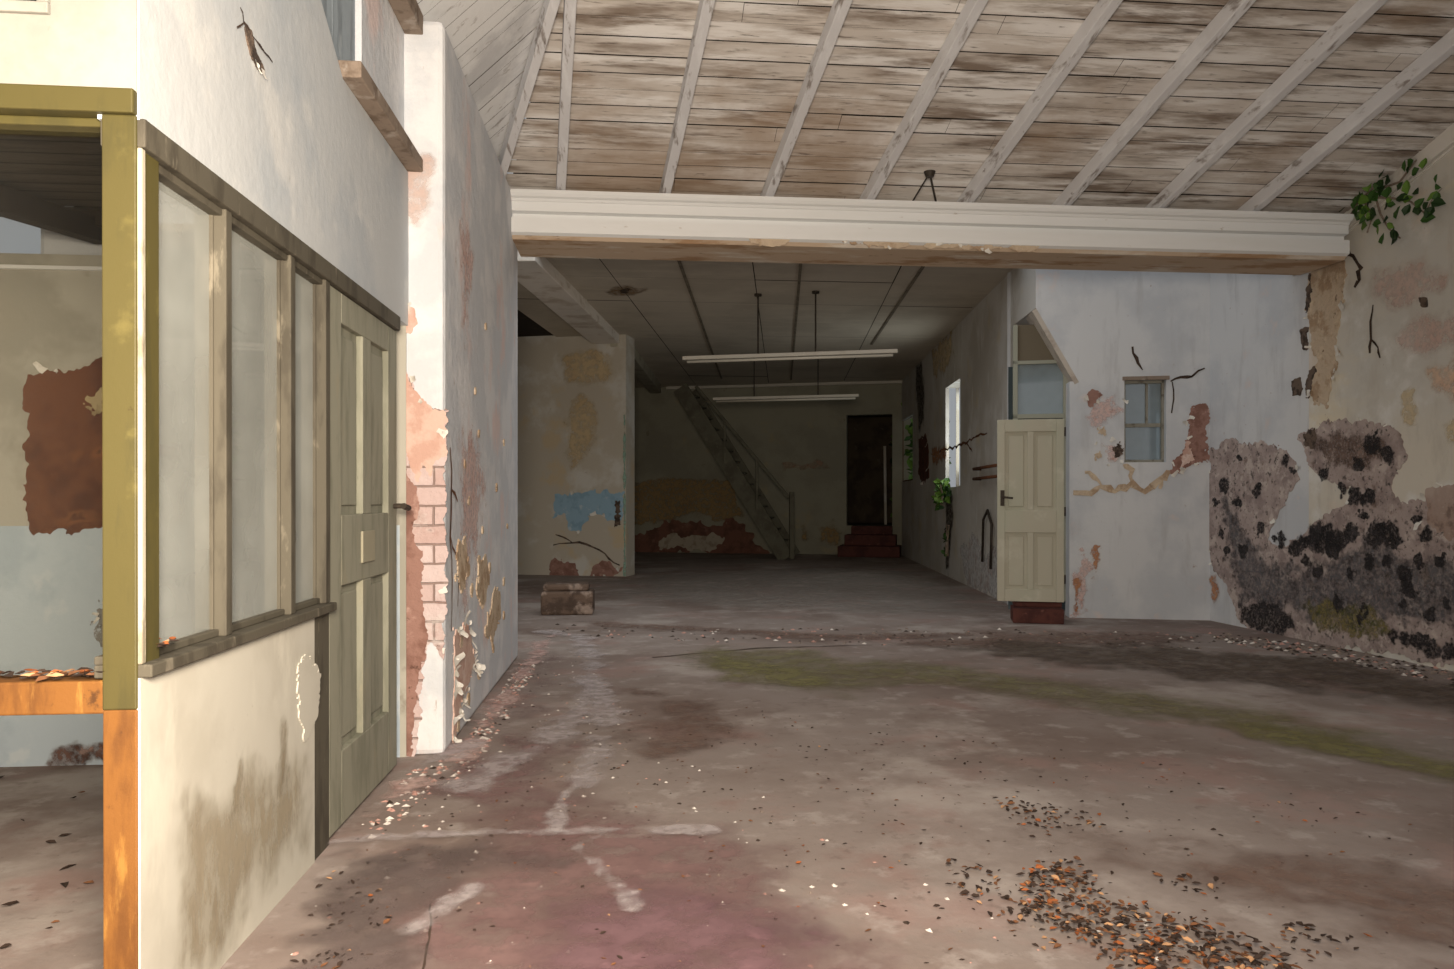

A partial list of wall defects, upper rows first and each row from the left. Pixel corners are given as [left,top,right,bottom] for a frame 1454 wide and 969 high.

crack [237,7,273,63]
flaking render [22,357,102,536]
peeling [1084,389,1128,466]
flaking render [1170,403,1210,477]
spalling [1303,428,1317,449]
flaking render [553,478,770,554]
flaking render [1413,482,1454,541]
flaking render [406,372,505,757]
flaking render [549,558,623,576]
peeling [90,600,103,647]
water stain [188,730,298,959]